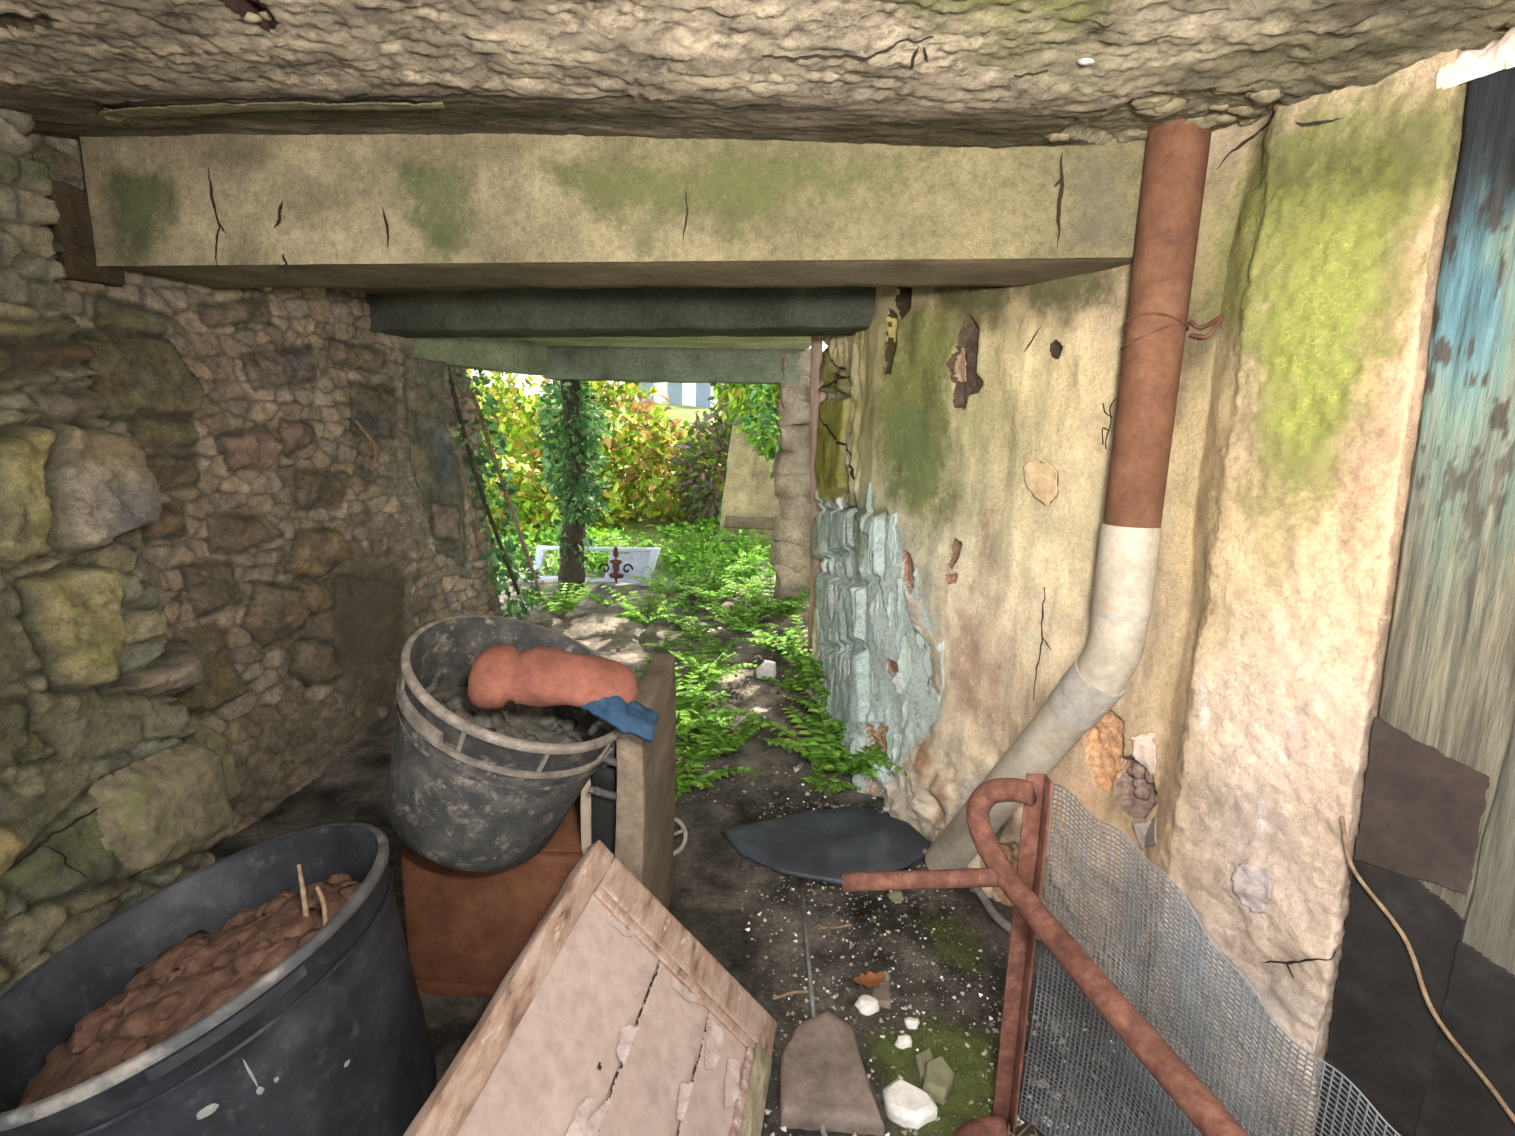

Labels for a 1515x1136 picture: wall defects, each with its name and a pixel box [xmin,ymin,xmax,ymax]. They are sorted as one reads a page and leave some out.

crack [762,36,933,70]
crack [208,168,225,271]
crack [1054,151,1064,248]
spalling [946,314,983,409]
leakage [1273,228,1371,453]
peeling [815,482,945,796]
spalling [1084,709,1158,850]